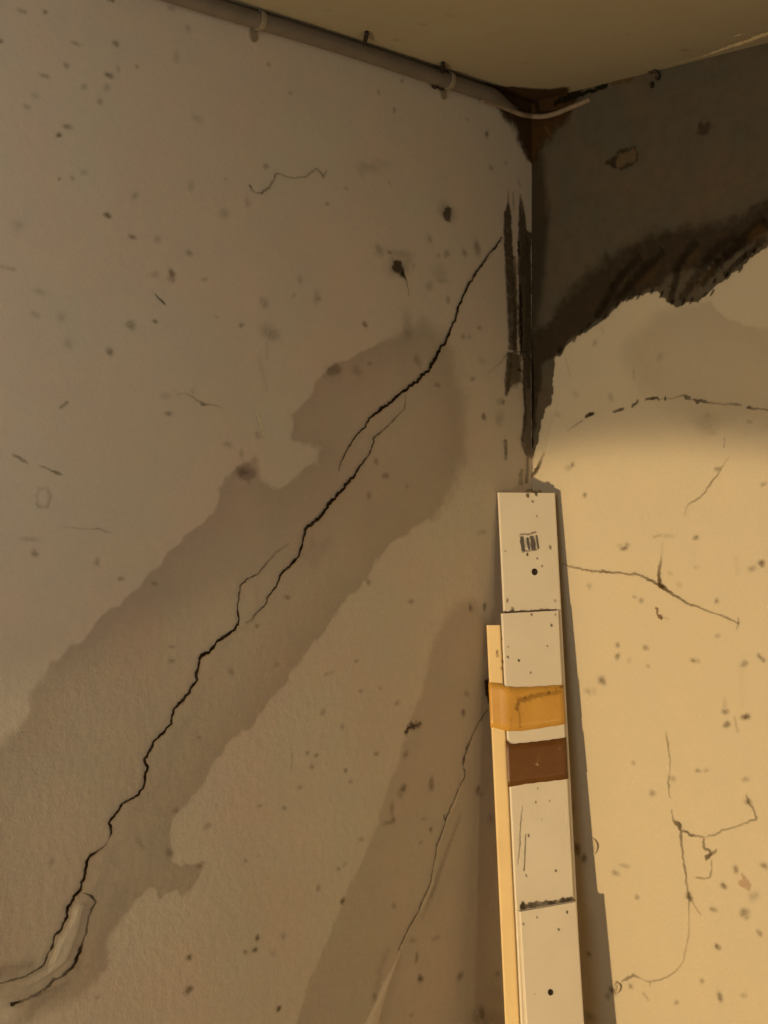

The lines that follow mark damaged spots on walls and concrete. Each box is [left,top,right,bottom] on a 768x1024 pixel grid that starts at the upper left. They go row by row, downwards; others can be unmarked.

leakage [554,78,629,106]
peeling [532,43,768,458]
leakage [504,199,532,458]
crack [585,395,704,418]
crack [643,572,683,602]
crack [0,237,502,1007]
crack [674,822,711,860]